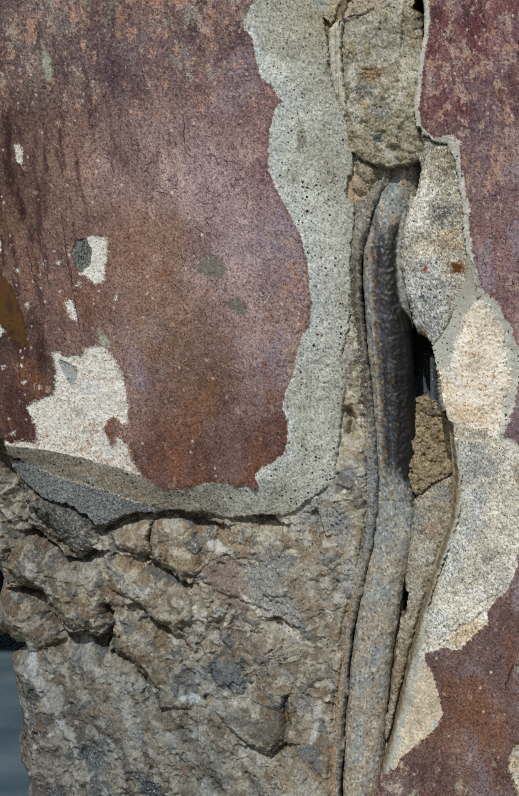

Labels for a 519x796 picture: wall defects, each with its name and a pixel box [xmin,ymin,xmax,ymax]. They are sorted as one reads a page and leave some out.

rust [0,274,27,348]
spalling [0,0,392,796]
spalling [375,0,519,796]